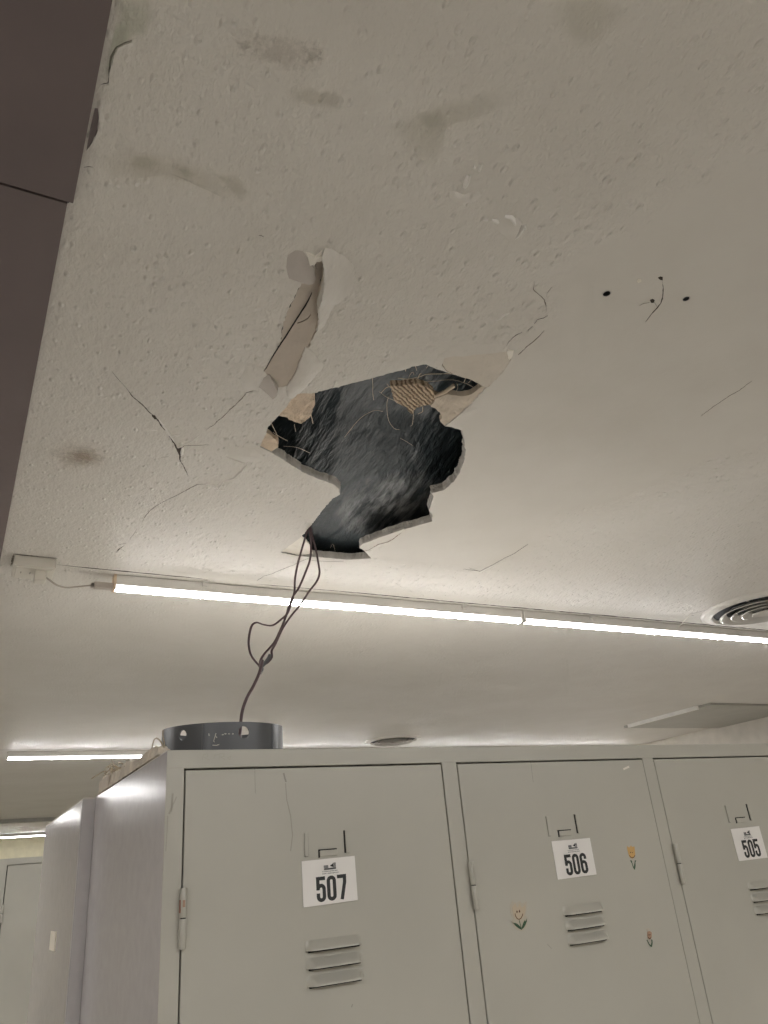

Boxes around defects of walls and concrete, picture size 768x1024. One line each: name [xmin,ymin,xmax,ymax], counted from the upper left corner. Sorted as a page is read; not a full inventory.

flaking render [241,247,355,399]
crack [496,287,552,355]
crack [64,373,252,582]
spalling [260,446,341,493]
spalling [281,431,466,560]
crack [257,552,768,631]